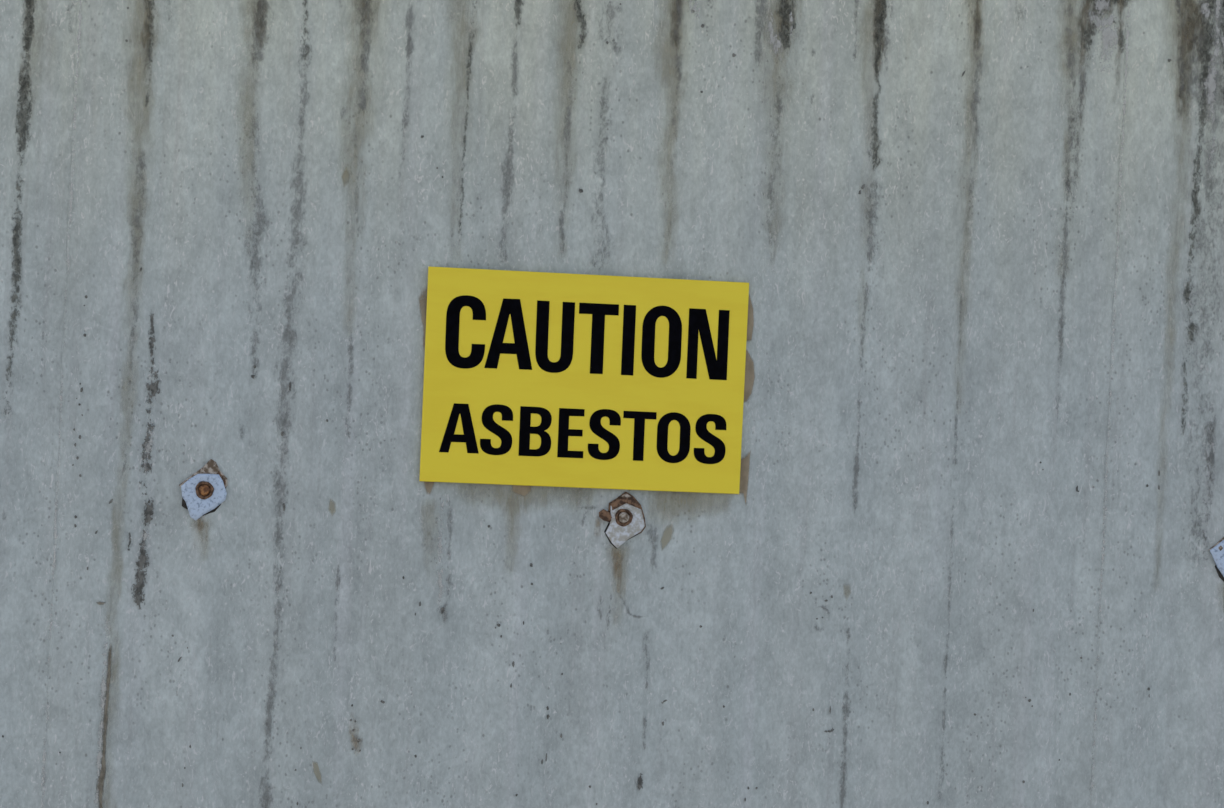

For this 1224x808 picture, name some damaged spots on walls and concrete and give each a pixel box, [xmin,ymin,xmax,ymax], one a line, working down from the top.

leakage [15,0,34,163]
leakage [126,2,154,81]
leakage [1168,0,1224,341]
leakage [6,180,23,393]
corrosion [598,494,641,524]